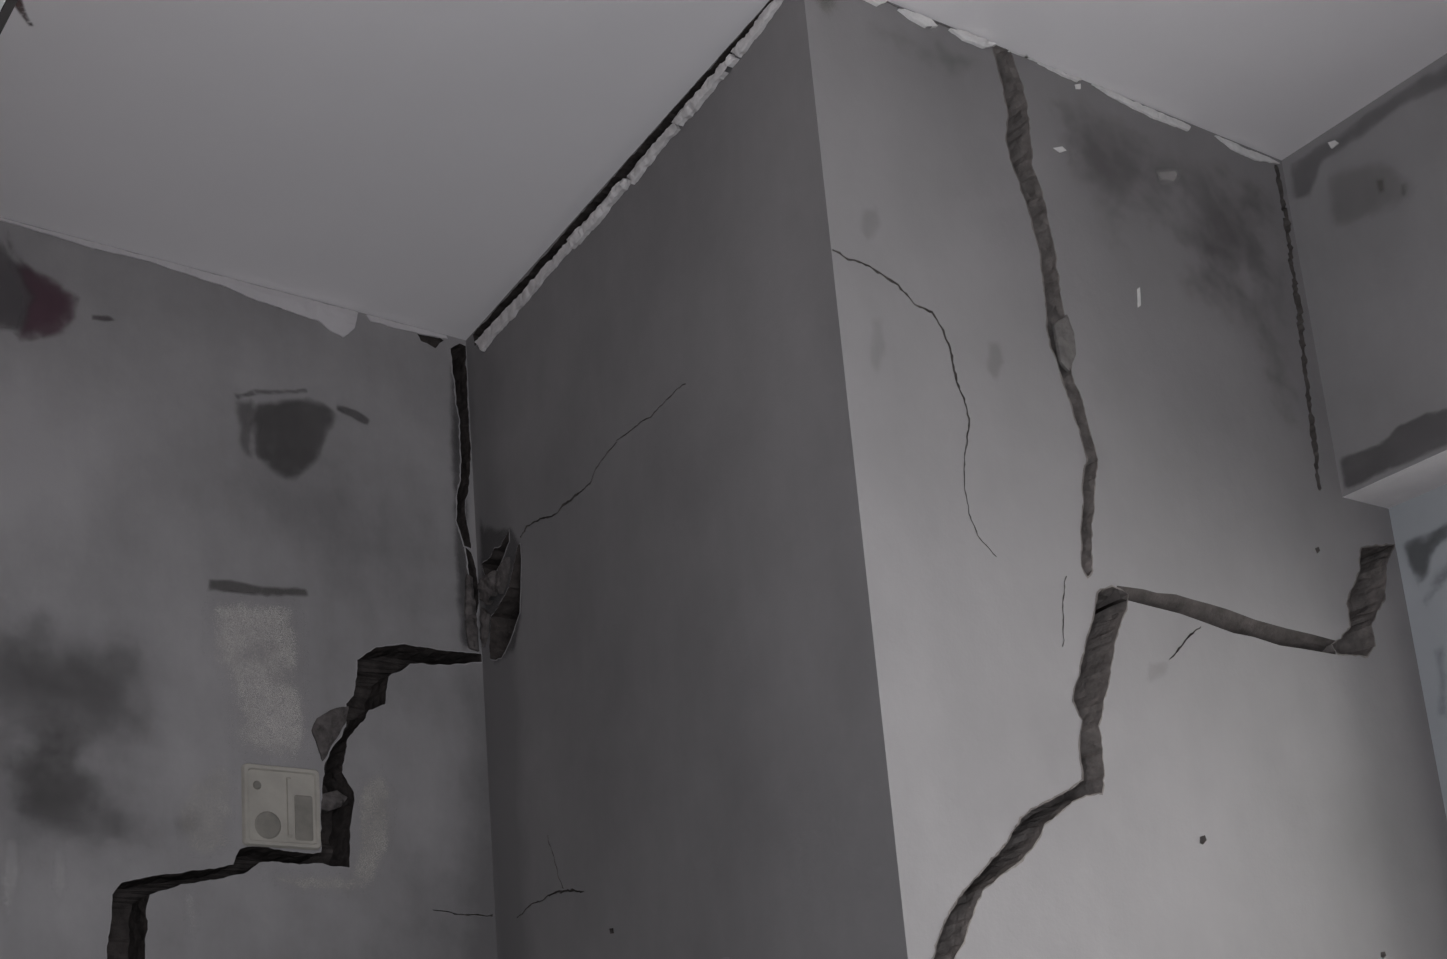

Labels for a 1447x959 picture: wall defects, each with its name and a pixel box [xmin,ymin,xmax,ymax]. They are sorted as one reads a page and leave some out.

leakage [0,262,72,335]
leakage [256,401,331,474]
crack [105,0,784,959]
crack [832,249,996,556]
crack [864,0,1395,959]